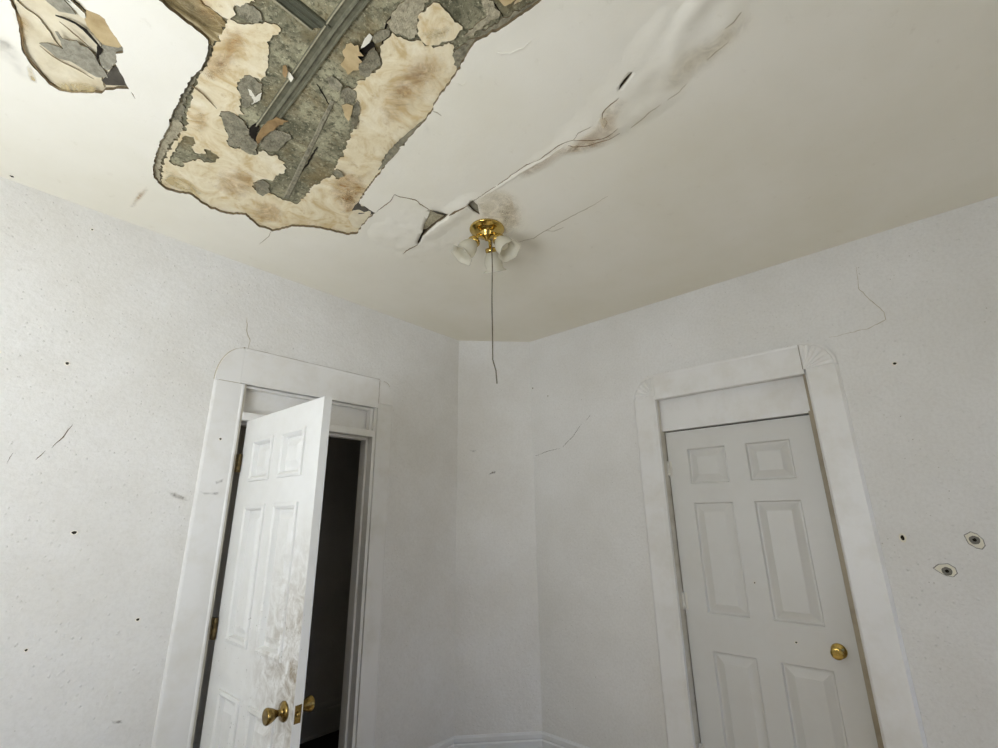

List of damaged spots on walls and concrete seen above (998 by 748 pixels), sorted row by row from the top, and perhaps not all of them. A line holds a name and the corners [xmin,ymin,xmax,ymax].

flaking render [236,3,263,24]
flaking render [340,0,429,77]
flaking render [452,0,538,68]
flaking render [153,44,213,182]
flaking render [220,75,292,155]
peeling [341,87,360,130]
crack [379,87,683,216]
flaking render [253,179,270,196]
flaking render [418,210,446,241]